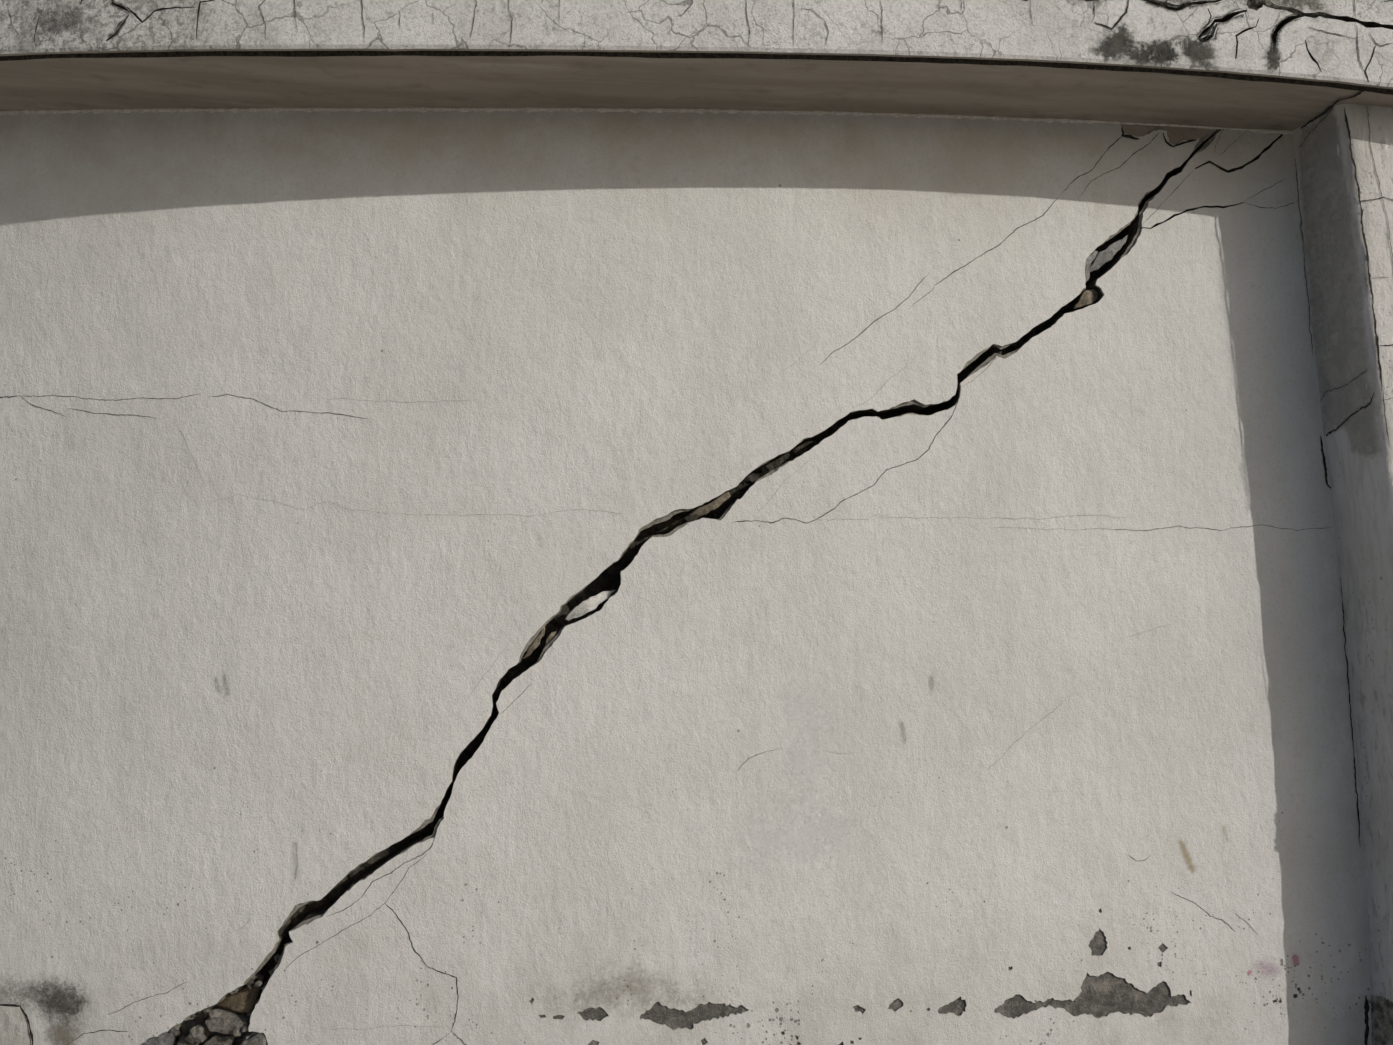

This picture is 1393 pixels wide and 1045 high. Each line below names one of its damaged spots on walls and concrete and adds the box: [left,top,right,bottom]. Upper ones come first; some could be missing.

crack [80,0,214,41]
crack [1087,0,1129,30]
mould [1093,23,1214,66]
damp [1267,43,1281,70]
crack [1143,0,1393,489]
crack [0,394,465,510]
crack [243,129,1331,1045]
crack [1340,578,1360,843]
peeling [1088,909,1108,956]
spalling [169,970,268,1045]
peeling [640,1002,749,1045]
peeling [994,943,1192,1019]